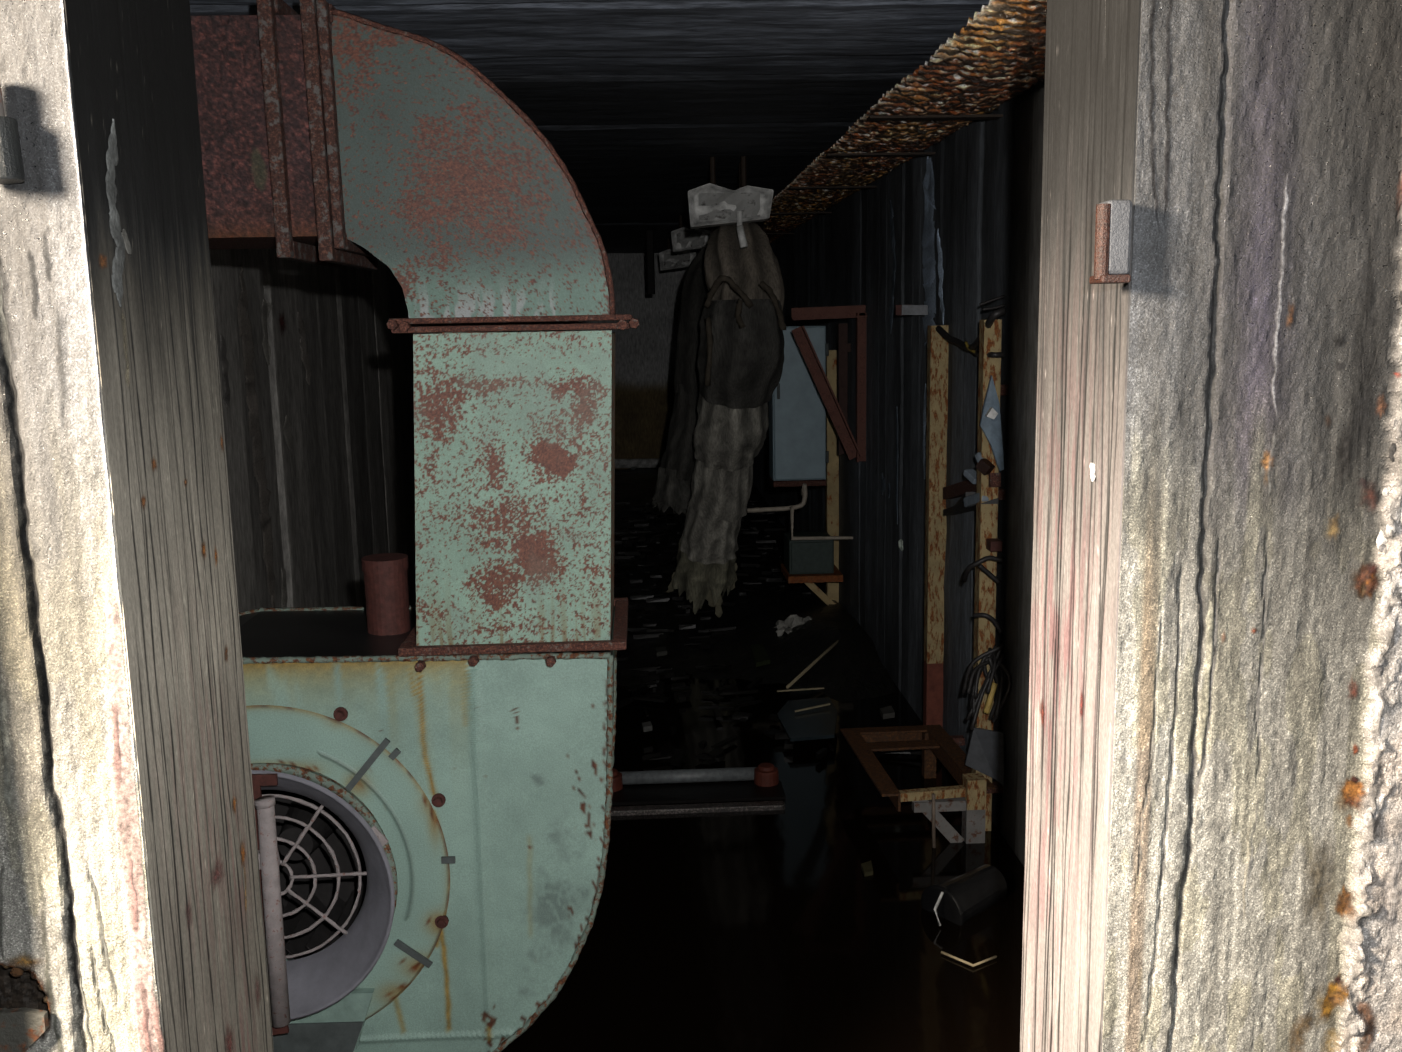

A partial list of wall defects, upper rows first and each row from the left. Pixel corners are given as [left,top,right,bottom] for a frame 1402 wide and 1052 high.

leakage [1273,193,1288,404]
crack [1139,34,1268,1048]
corrosion [1354,564,1377,597]
crack [0,280,117,1052]
corrosion [1340,777,1366,826]
corrosion [1335,886,1355,916]
corrosion [1293,976,1374,1051]